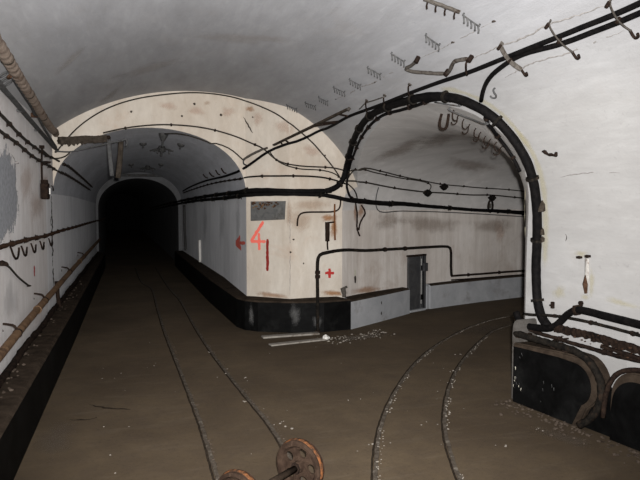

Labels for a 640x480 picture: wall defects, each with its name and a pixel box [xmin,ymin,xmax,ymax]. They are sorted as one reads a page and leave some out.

spalling [0,144,19,243]